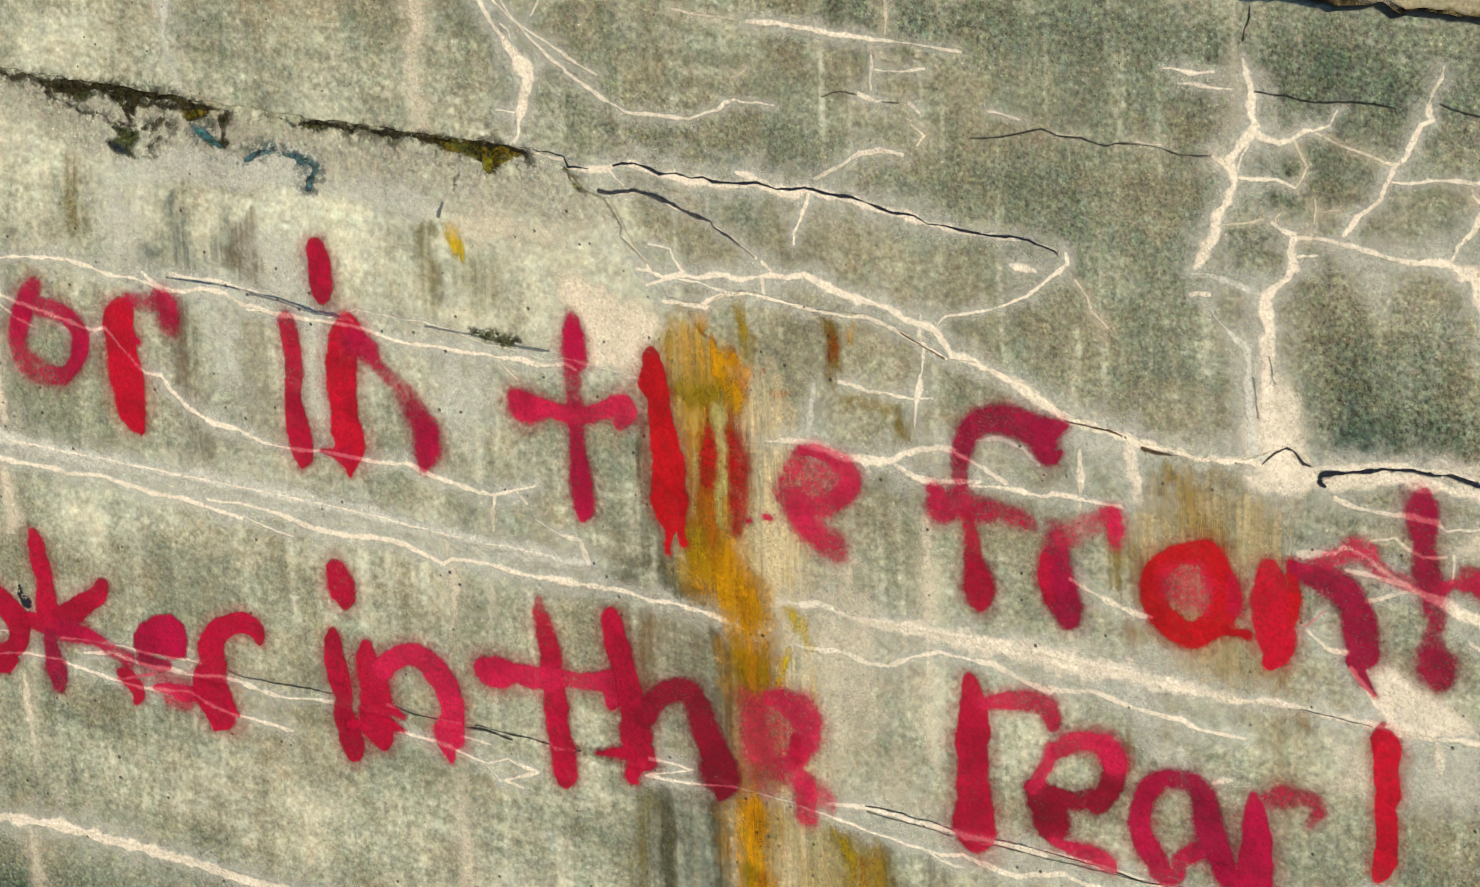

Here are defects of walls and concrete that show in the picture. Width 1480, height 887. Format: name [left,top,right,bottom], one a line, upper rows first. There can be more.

crack [141,364,323,458]
crack [0,251,564,380]
rust [813,312,856,380]
rust [895,418,911,448]
crack [476,0,1480,657]
rust [666,290,819,709]
crack [0,449,1247,743]
crack [395,707,581,789]
rust [737,757,888,887]
crack [645,753,1180,887]